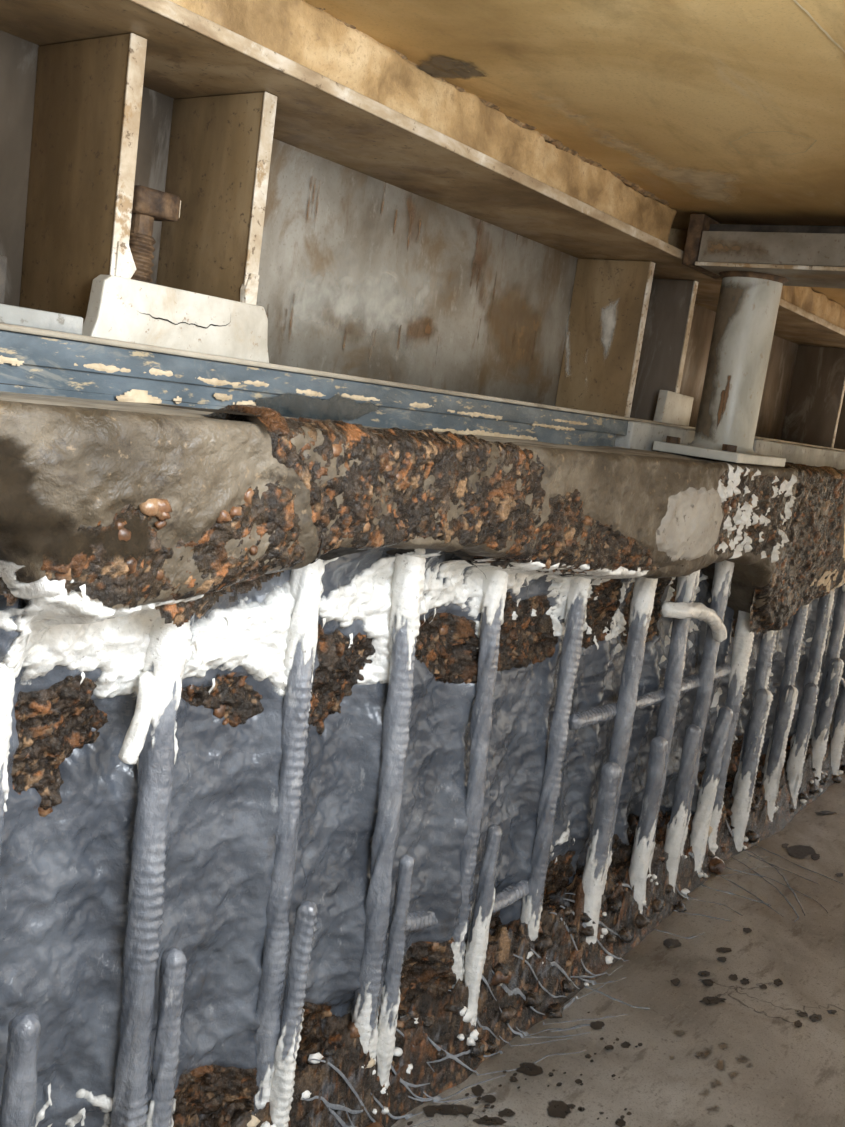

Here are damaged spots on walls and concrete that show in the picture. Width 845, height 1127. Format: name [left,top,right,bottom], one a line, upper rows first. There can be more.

crack [141,313,231,329]
corrosion [397,319,434,349]
corrosion [470,224,540,366]
corrosion [695,284,746,438]
water stain [0,438,151,565]
spalling [41,376,684,649]
spalling [714,462,845,637]
spalling [308,623,376,736]
spalling [415,612,479,684]
spalling [497,592,559,672]
spalling [11,675,109,817]
spalling [398,937,457,1012]